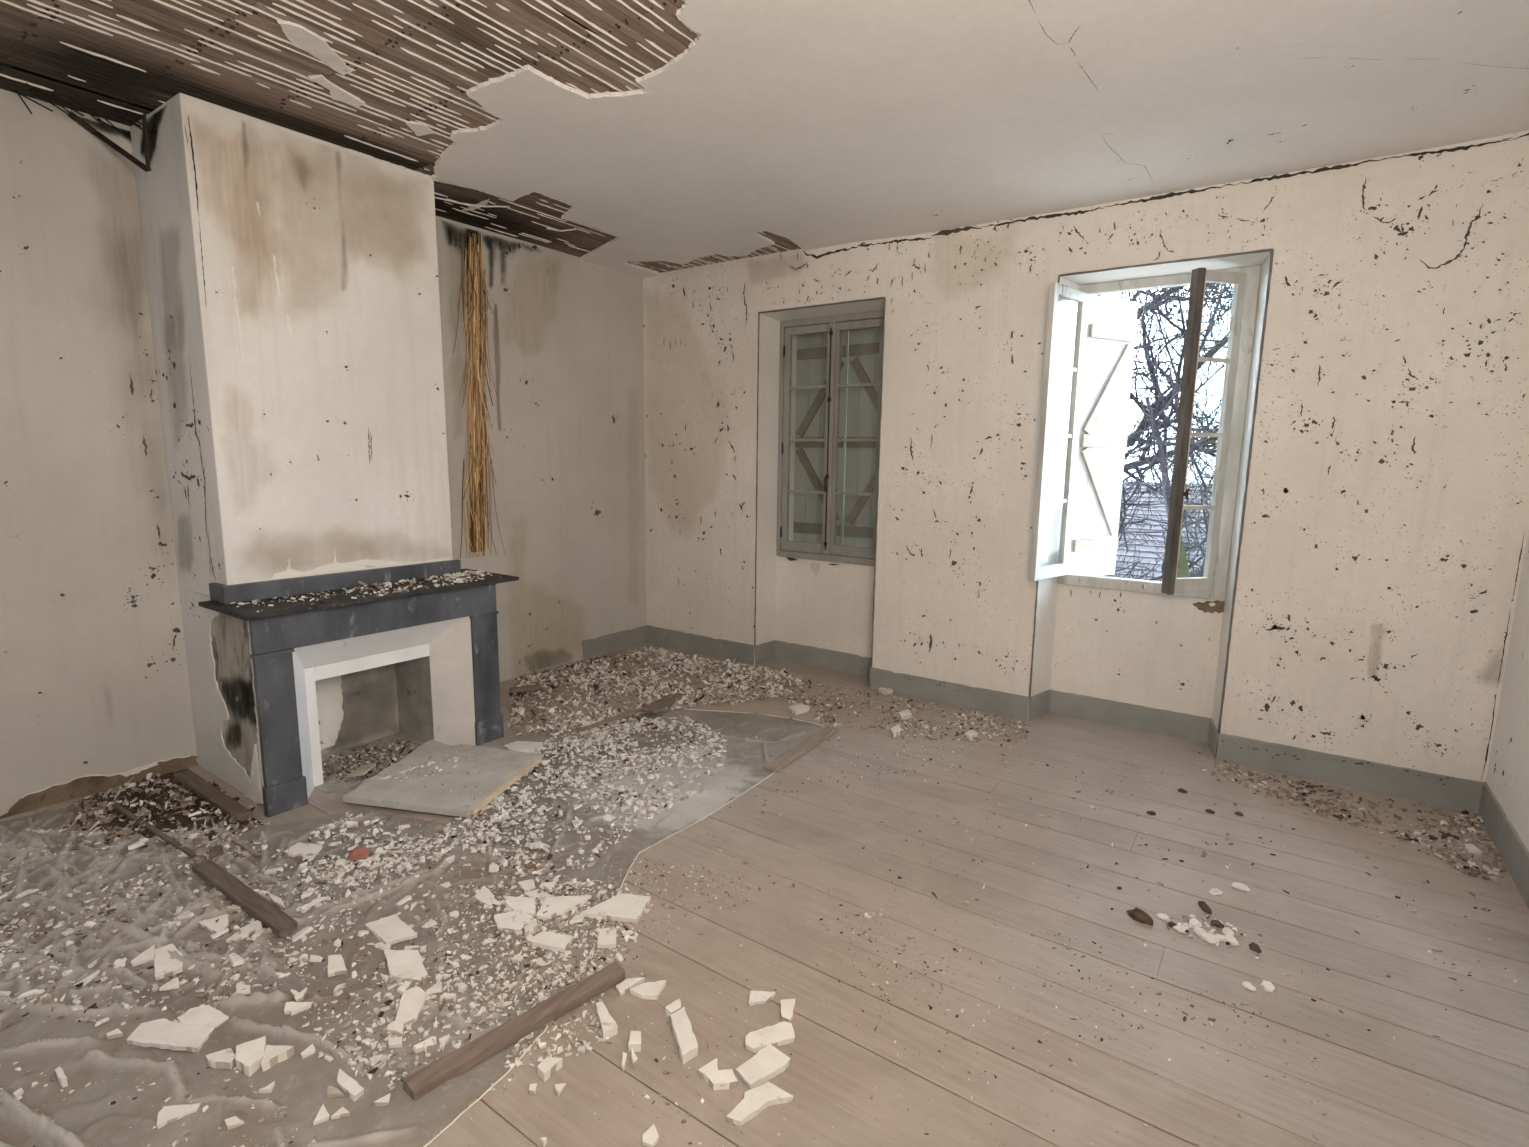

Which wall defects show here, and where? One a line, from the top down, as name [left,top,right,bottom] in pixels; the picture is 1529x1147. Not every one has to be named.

crack [1029,0,1098,90]
flaking render [0,0,699,259]
flaking render [622,231,802,366]
peeling [126,312,187,463]
damp [227,685,251,744]